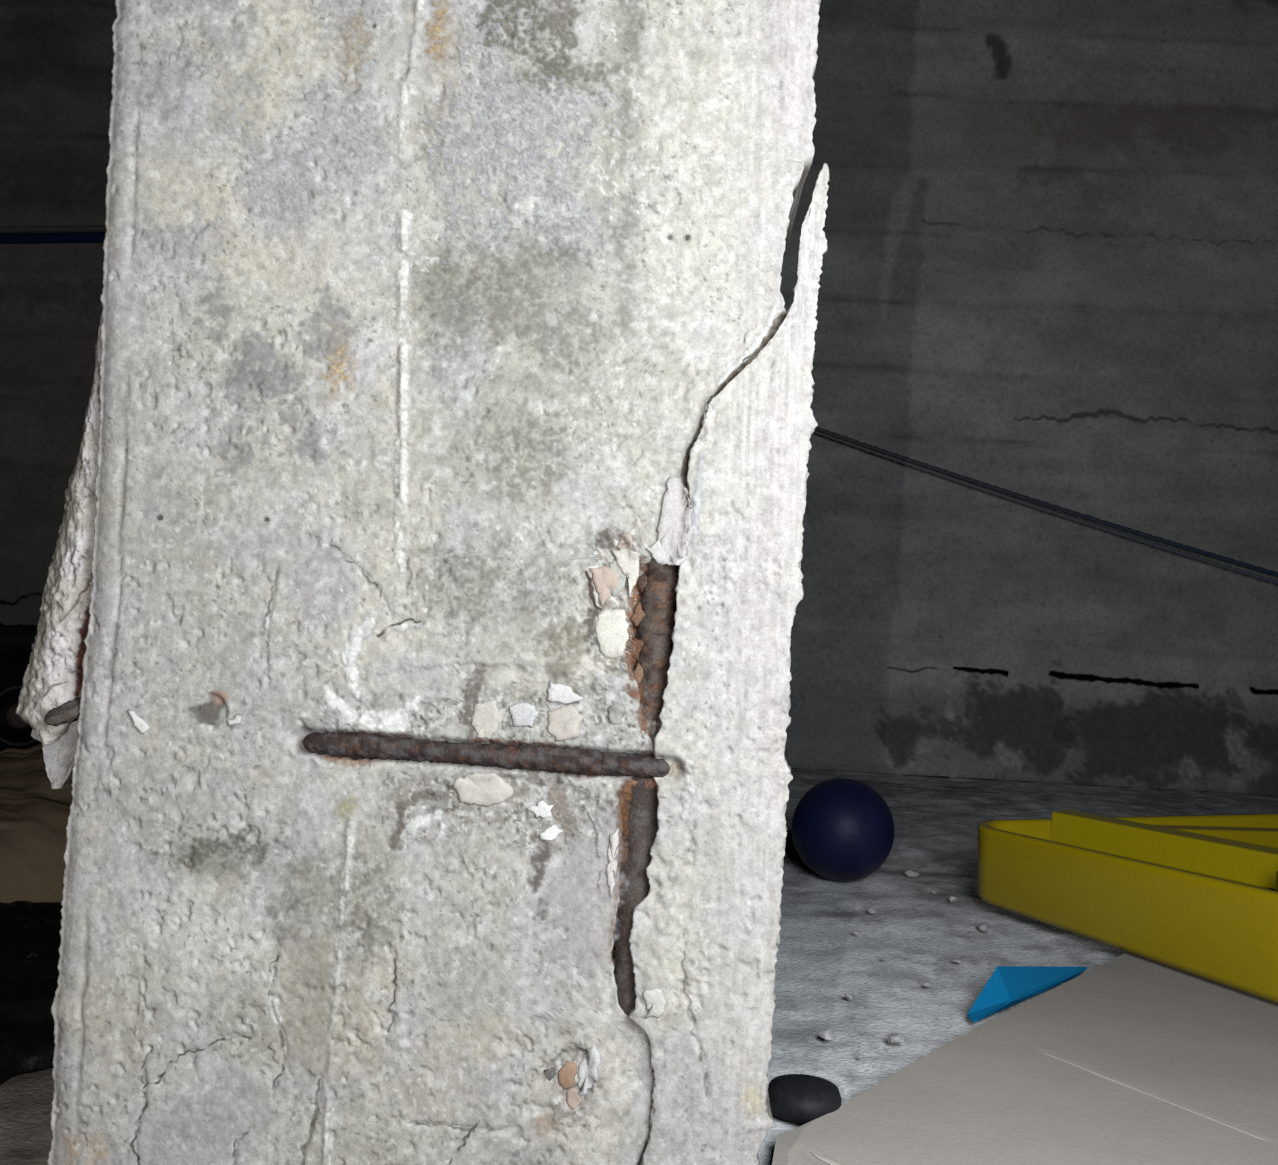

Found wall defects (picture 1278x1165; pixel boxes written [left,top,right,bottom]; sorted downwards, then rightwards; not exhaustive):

crack [681,306,788,543]
spalling [282,477,696,1018]
corrosion [474,737,580,749]
corrosion [625,559,657,732]
crack [888,666,1009,676]
leakage [880,680,1278,798]
crack [1049,671,1199,688]
crack [1250,686,1278,694]
corrosion [609,779,650,946]
crack [131,955,287,1165]
crack [301,1078,321,1165]
crack [639,1043,656,1165]